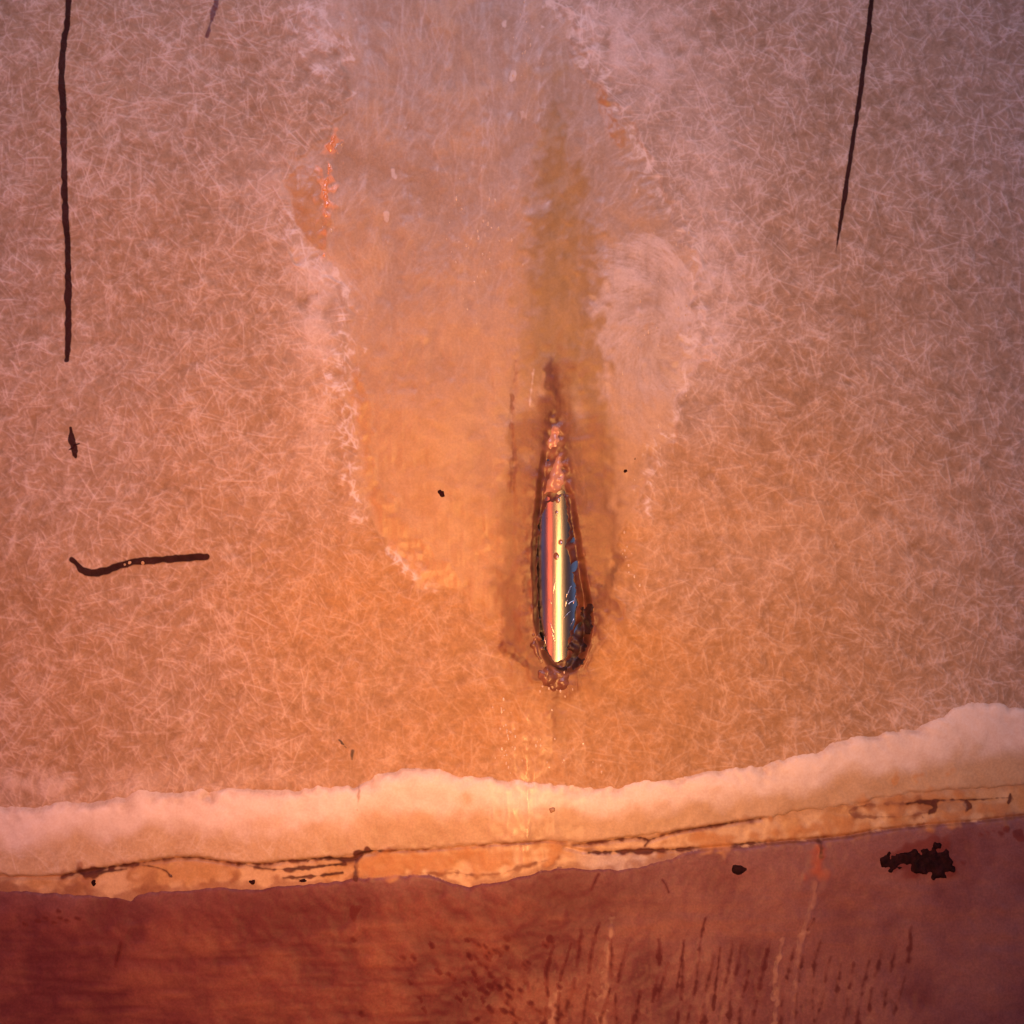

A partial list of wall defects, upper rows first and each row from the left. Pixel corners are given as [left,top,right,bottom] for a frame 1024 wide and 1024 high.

peeling [271,0,720,608]
corrosion [464,314,653,736]
hole [516,397,608,692]